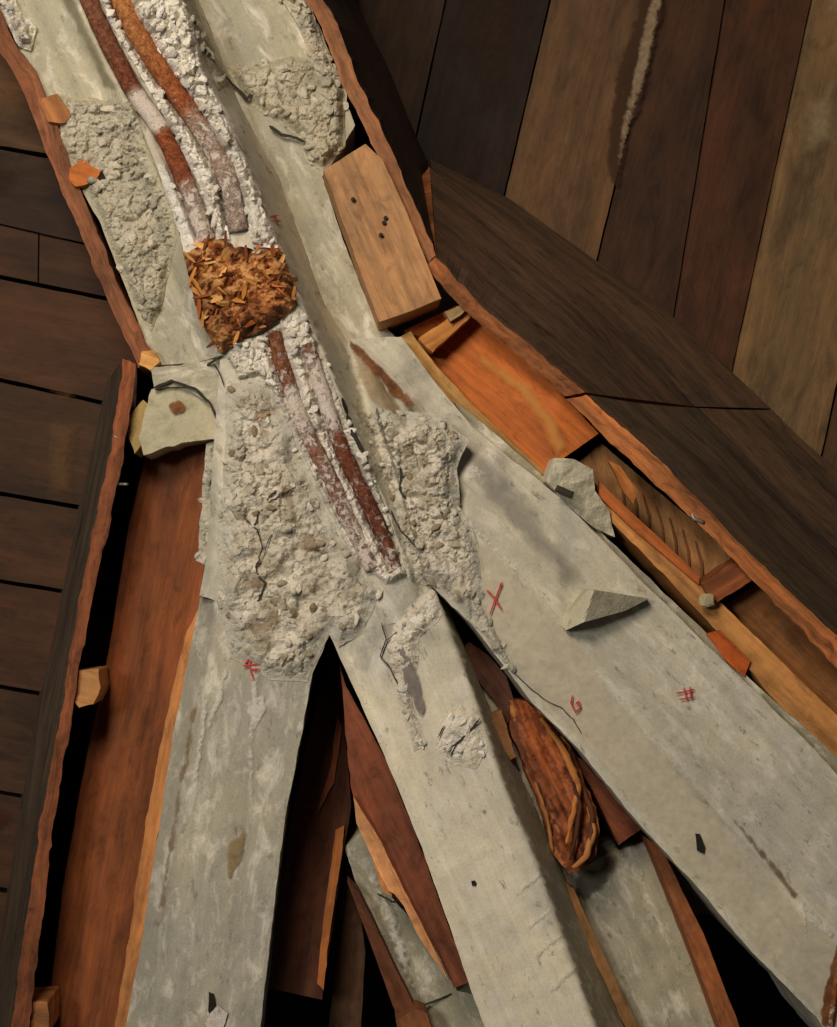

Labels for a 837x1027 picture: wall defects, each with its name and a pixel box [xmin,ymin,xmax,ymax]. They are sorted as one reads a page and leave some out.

spalling [55,93,198,331]
spalling [100,0,230,240]
spalling [131,0,349,249]
crack [153,355,224,419]
rust [351,343,414,408]
spalling [194,310,517,769]
crack [514,673,582,734]